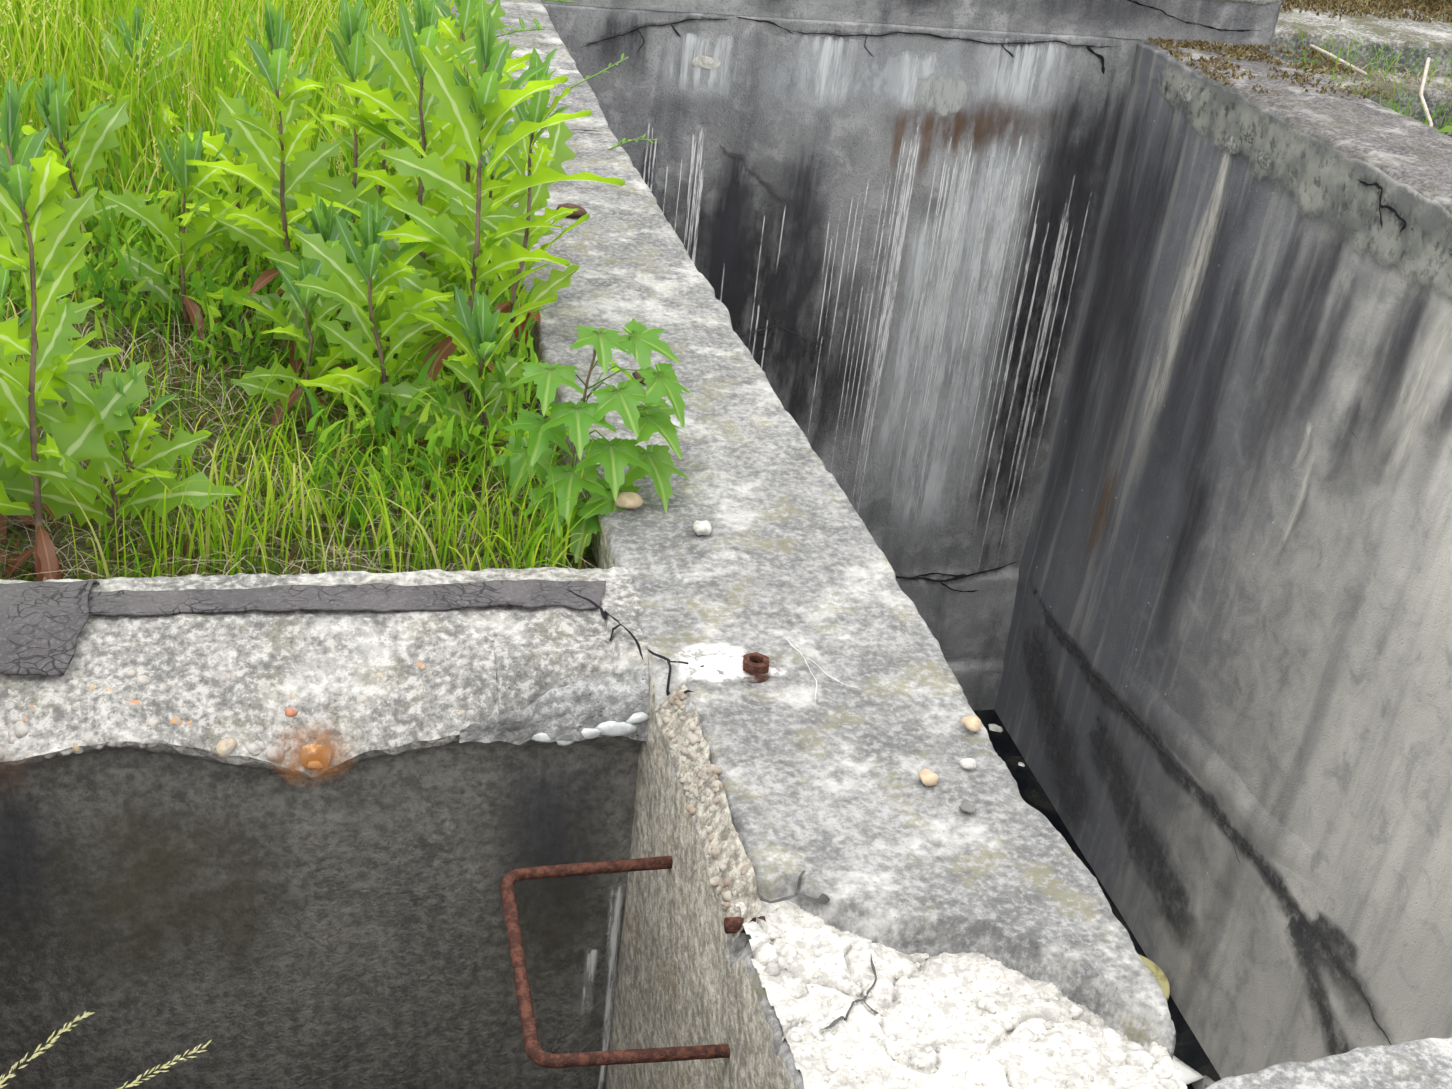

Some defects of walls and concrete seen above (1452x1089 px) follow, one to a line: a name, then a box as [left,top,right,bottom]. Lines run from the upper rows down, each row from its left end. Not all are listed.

crack [579,16,1119,74]
crack [1128,0,1262,32]
leakage [641,33,1175,529]
leakage [1146,155,1237,449]
leakage [1264,227,1344,402]
crack [1357,179,1406,234]
leakage [1376,293,1452,467]
leakage [1285,426,1312,539]
crack [895,561,1019,592]
leakage [521,774,578,943]
spalling [0,649,1187,1089]
leakage [1024,590,1356,1055]